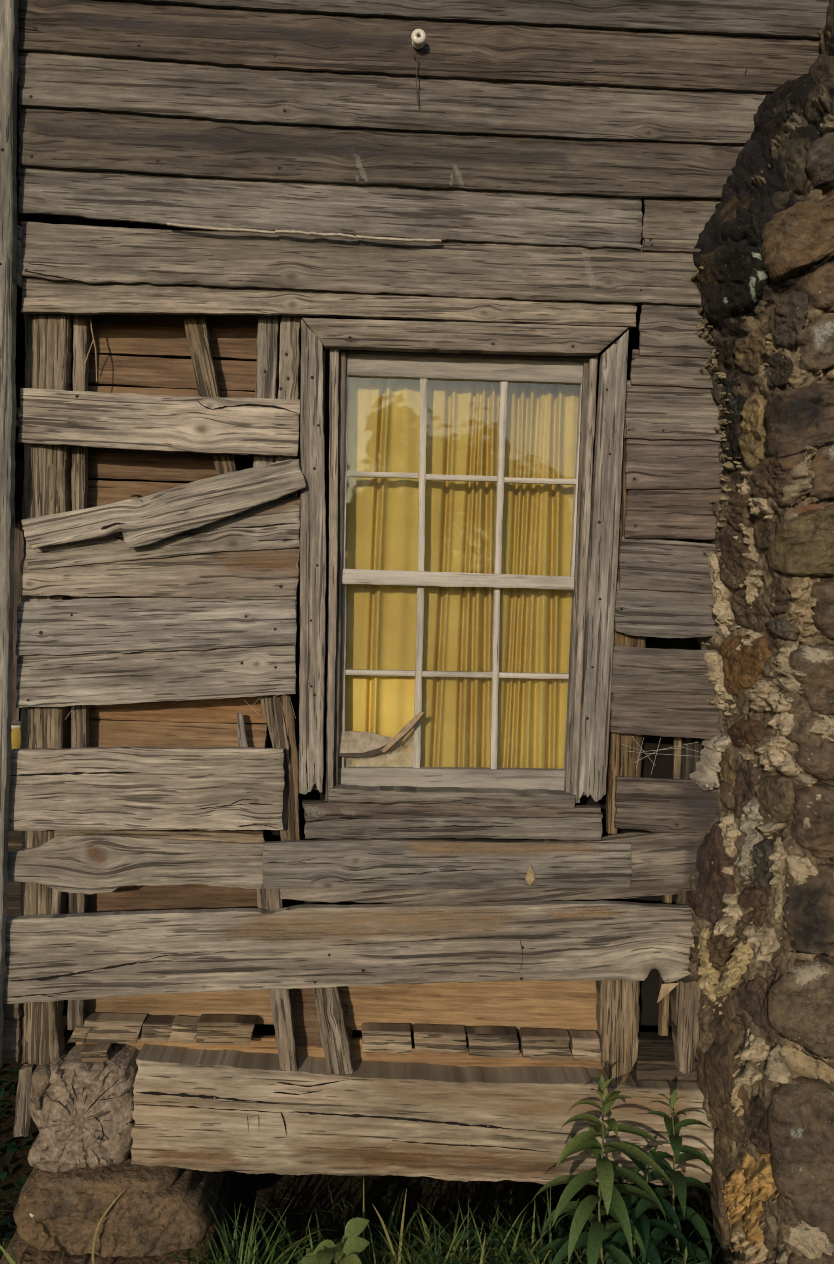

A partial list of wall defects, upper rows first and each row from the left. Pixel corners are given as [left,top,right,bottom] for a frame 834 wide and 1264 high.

crack [101,494,143,541]
crack [231,523,298,541]
crack [47,1075,568,1153]